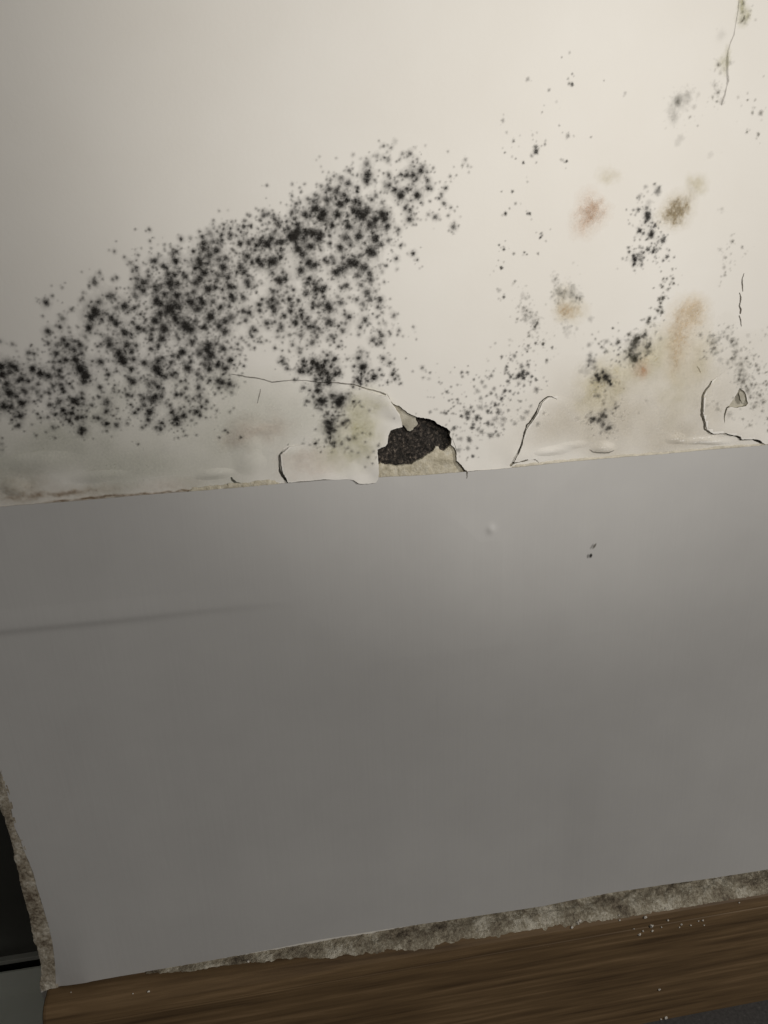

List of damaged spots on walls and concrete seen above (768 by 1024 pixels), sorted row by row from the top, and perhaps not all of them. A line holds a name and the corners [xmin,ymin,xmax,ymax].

leakage [629,209,668,266]
leakage [0,153,452,447]
leakage [617,278,675,361]
crack [279,452,288,483]
crack [234,374,386,403]
peeling [189,386,595,491]
leakage [453,356,537,441]
crack [510,396,554,466]
crack [697,367,762,443]
spalling [0,770,58,992]